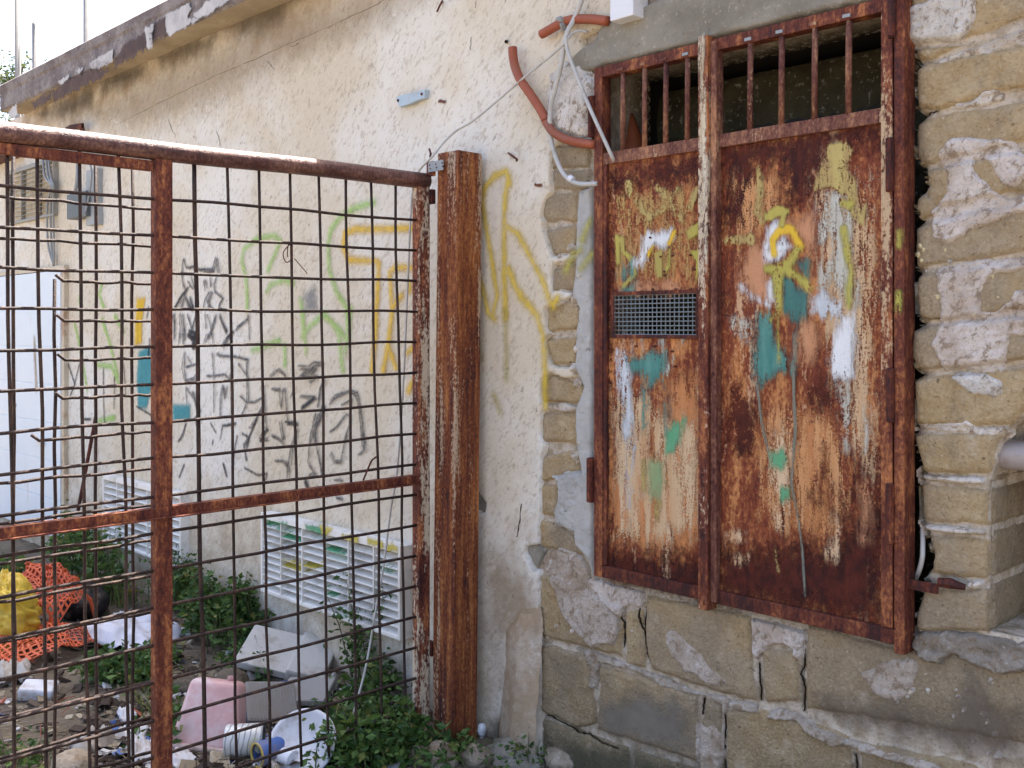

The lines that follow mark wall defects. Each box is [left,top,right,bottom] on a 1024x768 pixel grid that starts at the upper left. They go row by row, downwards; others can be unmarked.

peeling [31,0,229,109]
peeling [910,0,976,51]
rust [608,156,698,225]
rust [721,124,881,229]
peeling [915,137,1024,398]
rust [608,237,698,586]
rust [720,382,881,625]
crack [620,607,650,659]
crack [757,663,765,700]
crack [799,630,807,711]